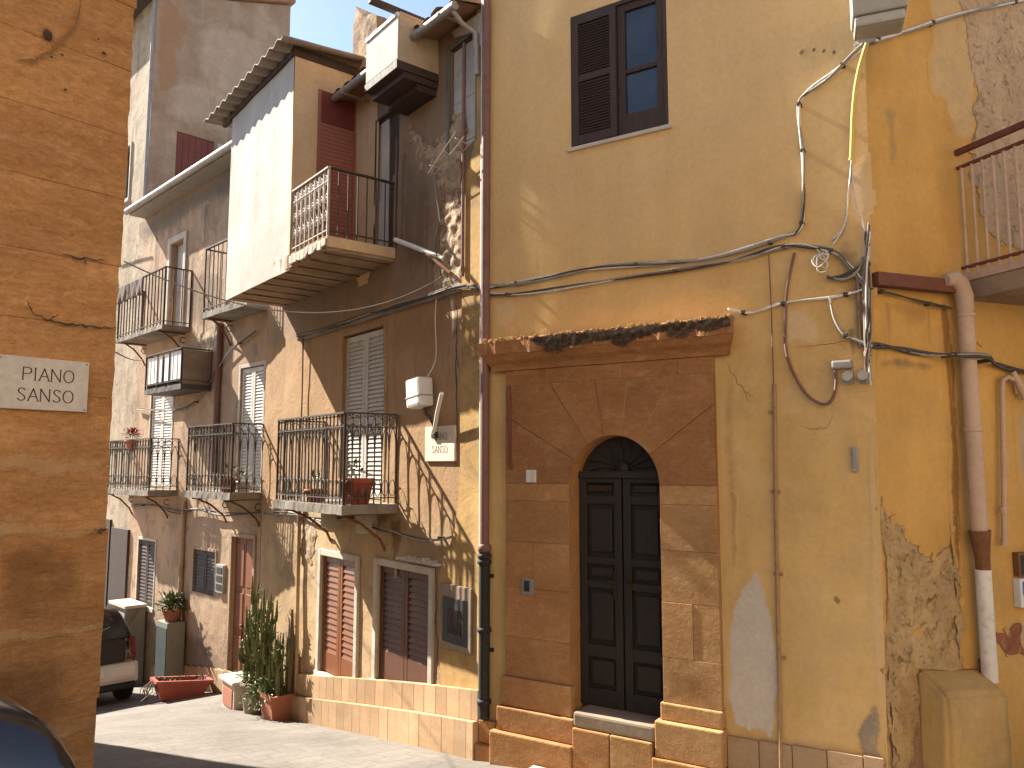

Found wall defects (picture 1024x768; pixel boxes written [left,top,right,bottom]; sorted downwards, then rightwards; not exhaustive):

flaking render [926,0,1024,249]
flaking render [858,496,966,768]
spalling [996,623,1024,657]